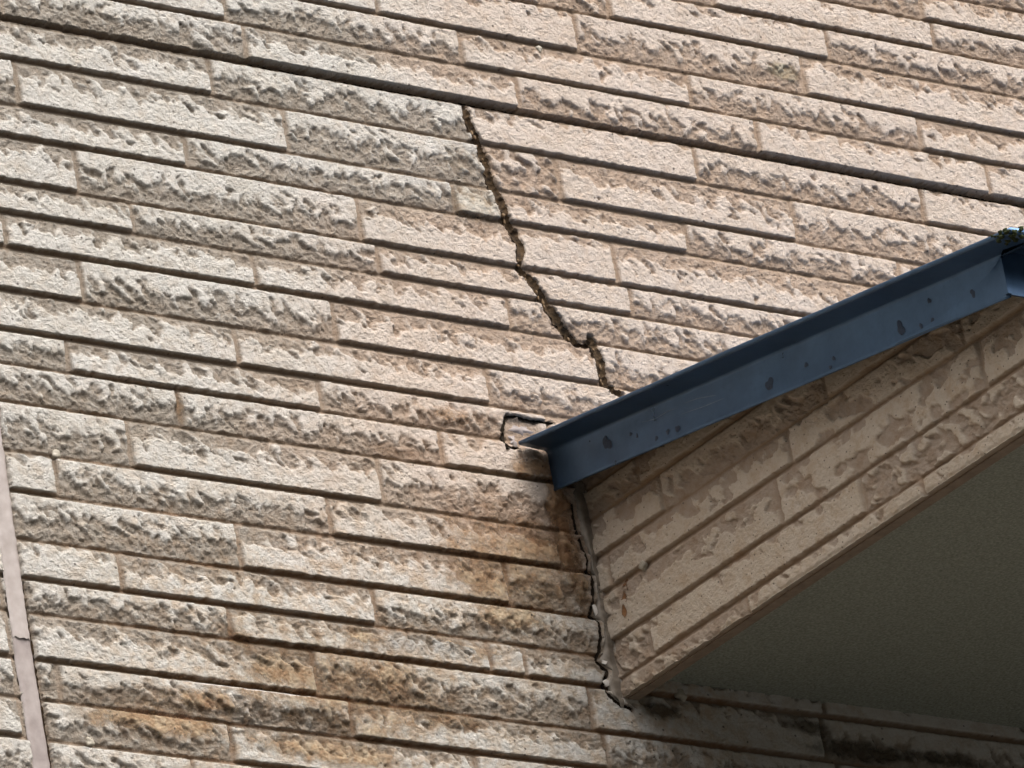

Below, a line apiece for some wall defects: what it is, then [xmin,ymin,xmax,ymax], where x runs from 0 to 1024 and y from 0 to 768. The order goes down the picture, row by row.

crack [462,109,621,397]
crack [500,415,553,450]
crack [571,504,632,712]